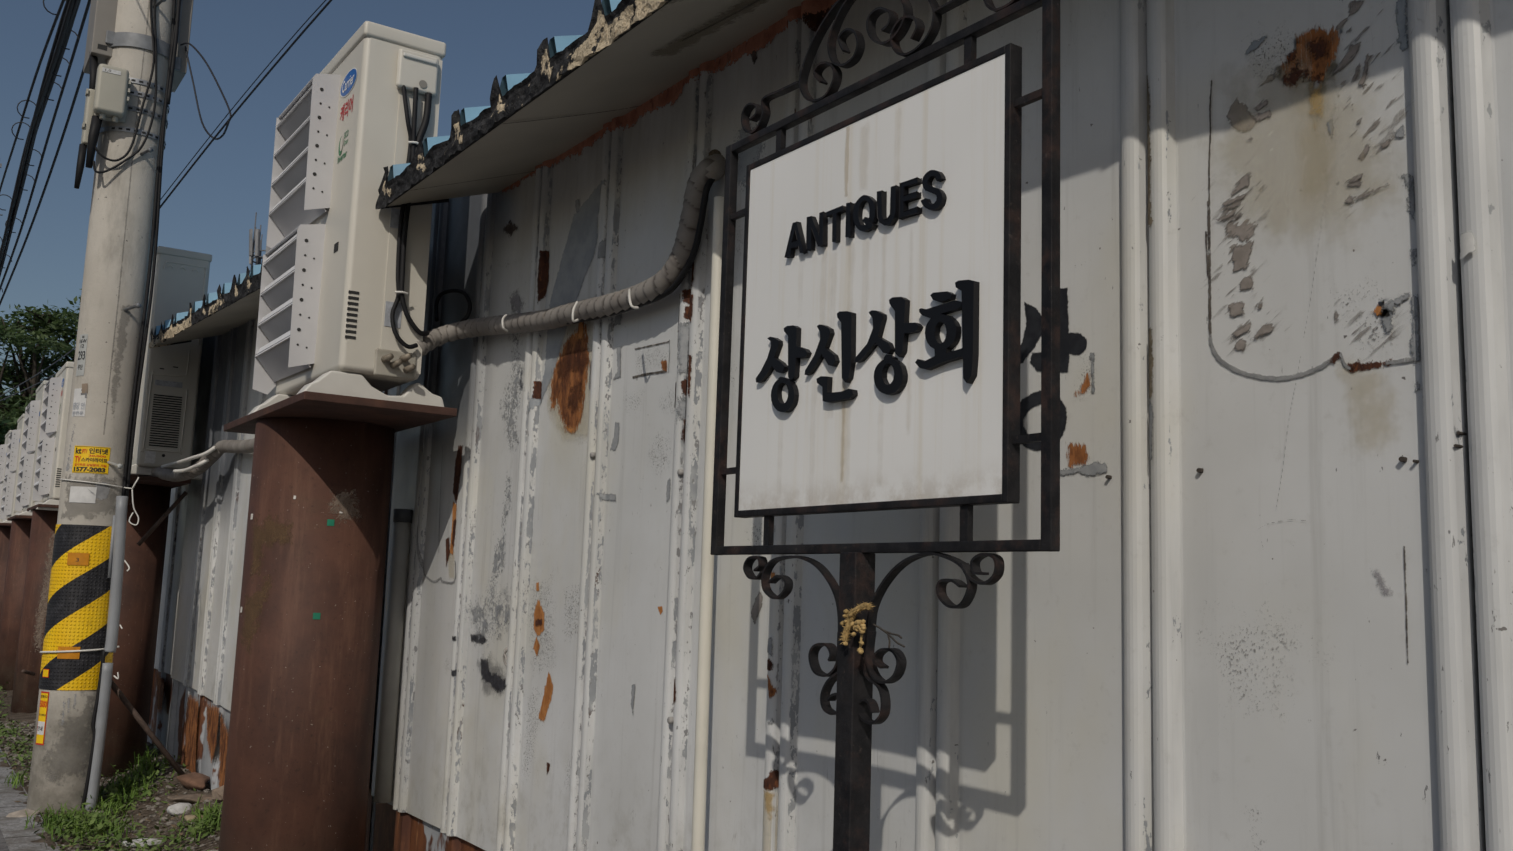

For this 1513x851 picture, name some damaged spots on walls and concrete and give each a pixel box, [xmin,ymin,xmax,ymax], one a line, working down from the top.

rust [502,0,837,192]
peeling [1226,36,1288,141]
rust [1282,26,1340,90]
peeling [1337,125,1415,219]
rust [537,250,549,303]
rust [532,322,590,438]
peeling [1217,172,1274,351]
peeling [1334,292,1420,364]
rust [446,445,463,565]
rust [522,582,553,774]
rust [184,694,228,787]